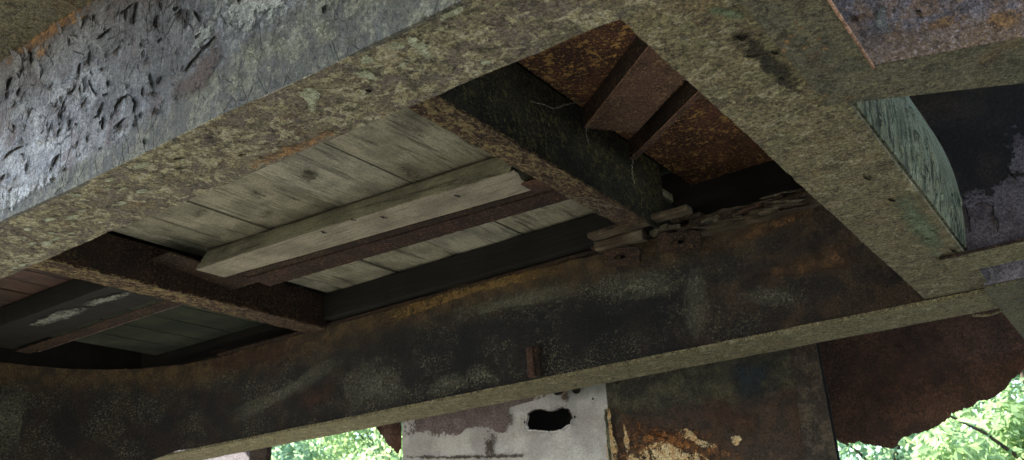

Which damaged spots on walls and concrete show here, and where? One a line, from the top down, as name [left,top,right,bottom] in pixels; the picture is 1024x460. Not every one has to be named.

rust [939,238,1024,260]
rust [374,266,573,324]
peeling [604,404,742,460]
rust [605,349,807,460]